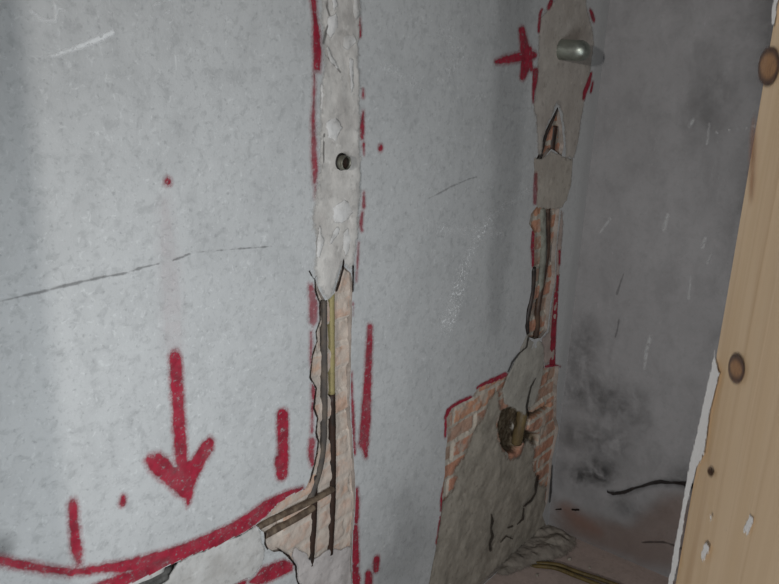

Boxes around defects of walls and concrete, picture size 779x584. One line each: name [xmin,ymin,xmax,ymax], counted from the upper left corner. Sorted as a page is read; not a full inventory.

flaking render [526,207,560,339]
flaking render [234,265,355,581]
flaking render [442,359,559,525]
crack [607,480,693,495]